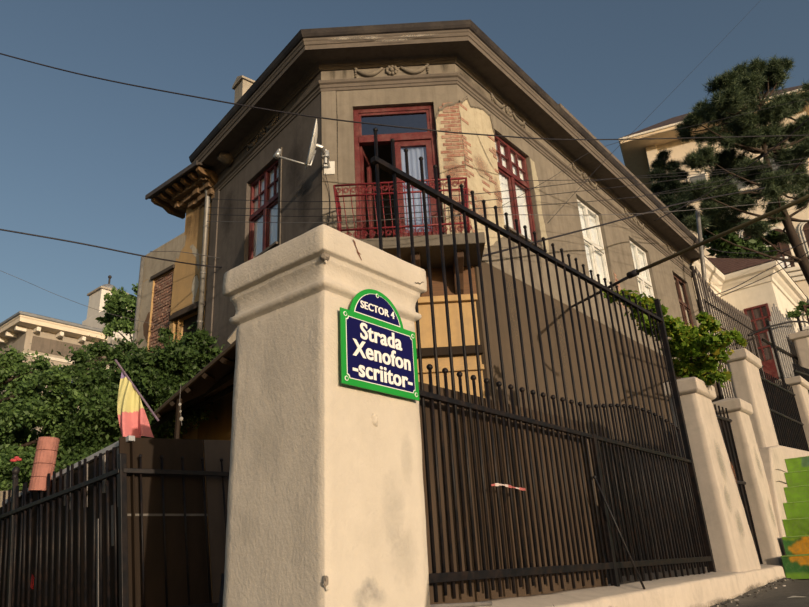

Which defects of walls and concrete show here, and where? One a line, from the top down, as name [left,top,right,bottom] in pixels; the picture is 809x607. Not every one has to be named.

flaking render [435,96,506,248]